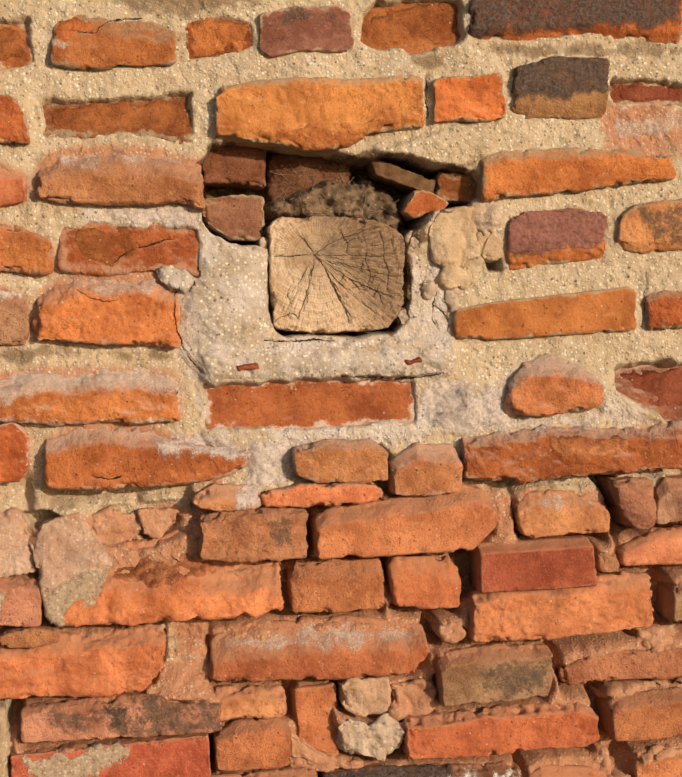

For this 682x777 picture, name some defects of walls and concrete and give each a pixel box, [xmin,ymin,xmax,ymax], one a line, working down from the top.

crack [114,238,175,263]
crack [174,288,204,374]